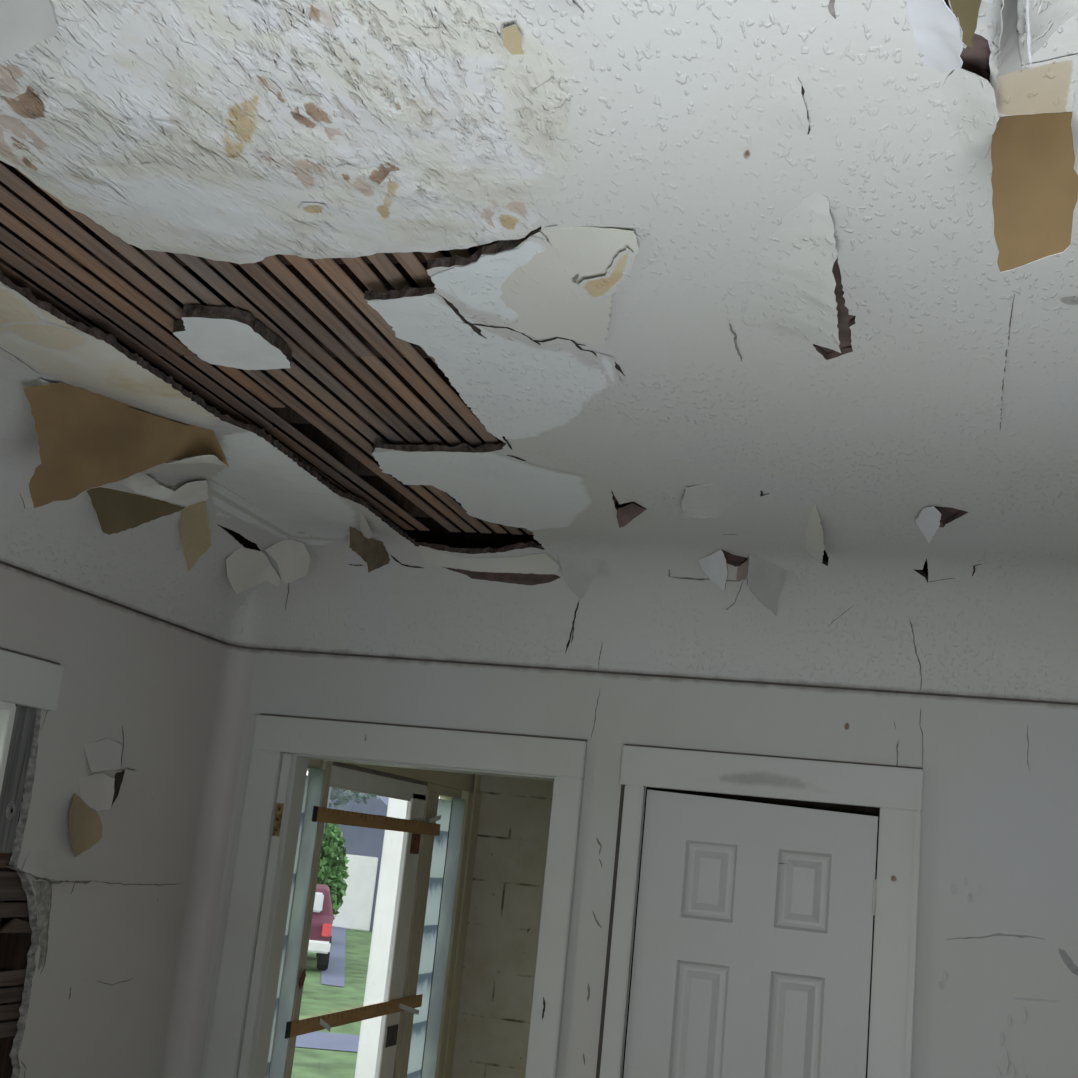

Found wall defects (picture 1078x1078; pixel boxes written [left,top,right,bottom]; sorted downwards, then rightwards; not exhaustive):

peeling [907,0,1078,273]
peeling [745,191,856,360]
peeling [0,226,639,595]
crack [1000,294,1015,429]
crack [565,601,579,653]
peeling [611,490,647,528]
peeling [698,549,788,616]
peeling [916,506,968,543]
peeling [70,726,137,857]
spalling [5,708,52,1078]
crack [22,849,180,894]
crack [948,932,1045,940]